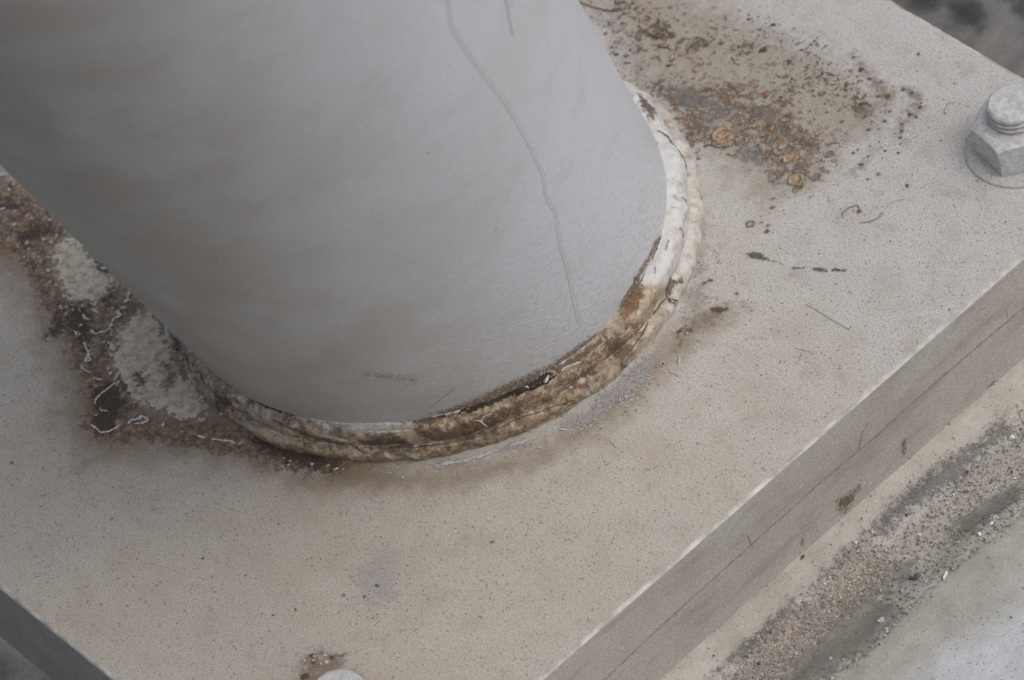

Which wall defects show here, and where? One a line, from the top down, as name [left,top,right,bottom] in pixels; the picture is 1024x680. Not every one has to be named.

crack [256,337,602,454]
rust [0,0,930,478]